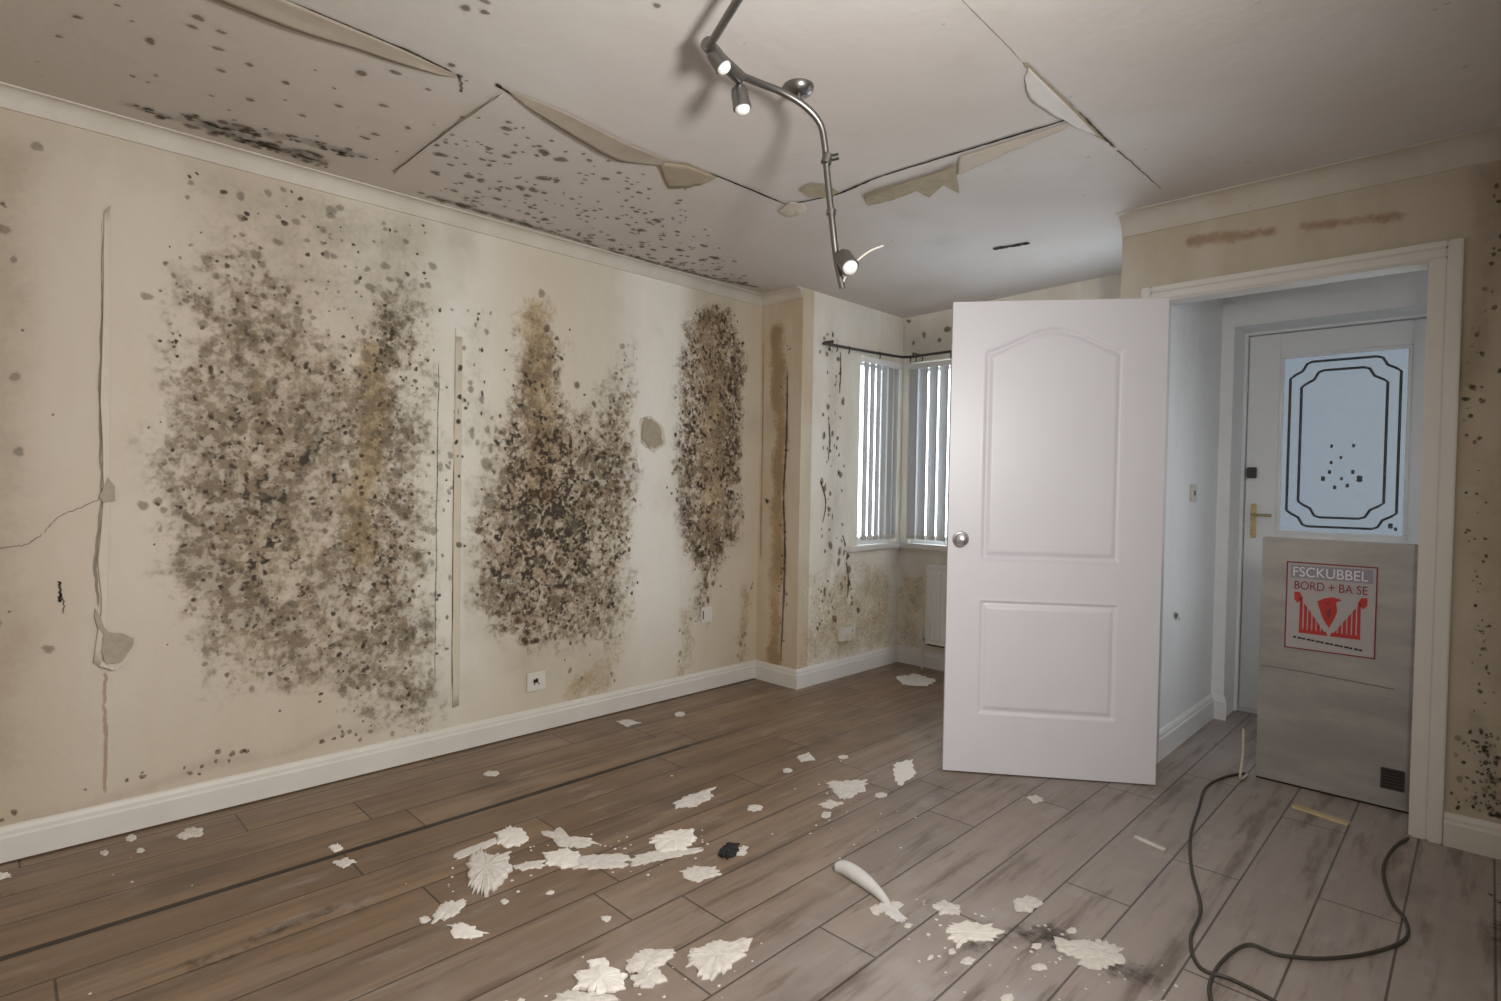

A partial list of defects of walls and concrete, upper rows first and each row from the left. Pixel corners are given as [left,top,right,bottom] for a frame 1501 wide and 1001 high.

damp [419,121,757,287]
damp [148,211,641,743]
damp [666,305,747,622]
damp [816,332,859,630]
damp [1462,385,1485,444]
crack [57,581,65,613]
damp [1465,529,1495,712]
damp [1450,729,1501,818]